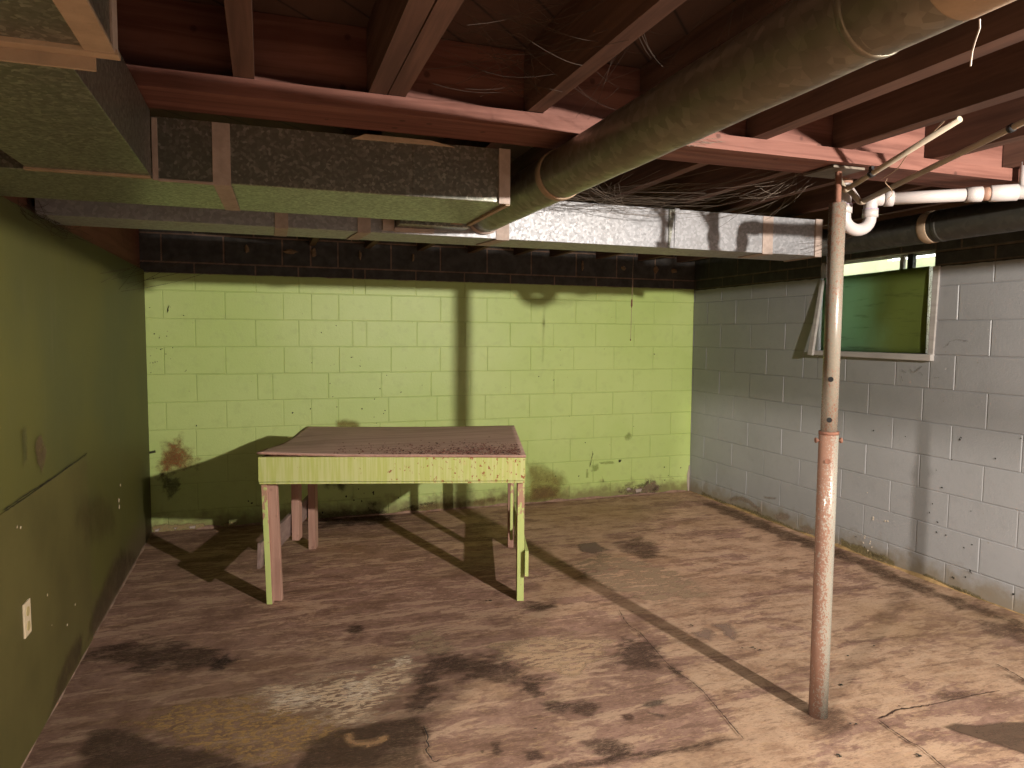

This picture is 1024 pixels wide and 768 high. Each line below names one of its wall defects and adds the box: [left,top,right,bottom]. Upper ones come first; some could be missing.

corrosion [160,441,192,492]
water stain [530,469,561,499]
water stain [702,492,815,547]
water stain [834,539,1023,639]
water stain [87,642,231,672]
water stain [298,654,597,768]
crack [879,663,1024,768]